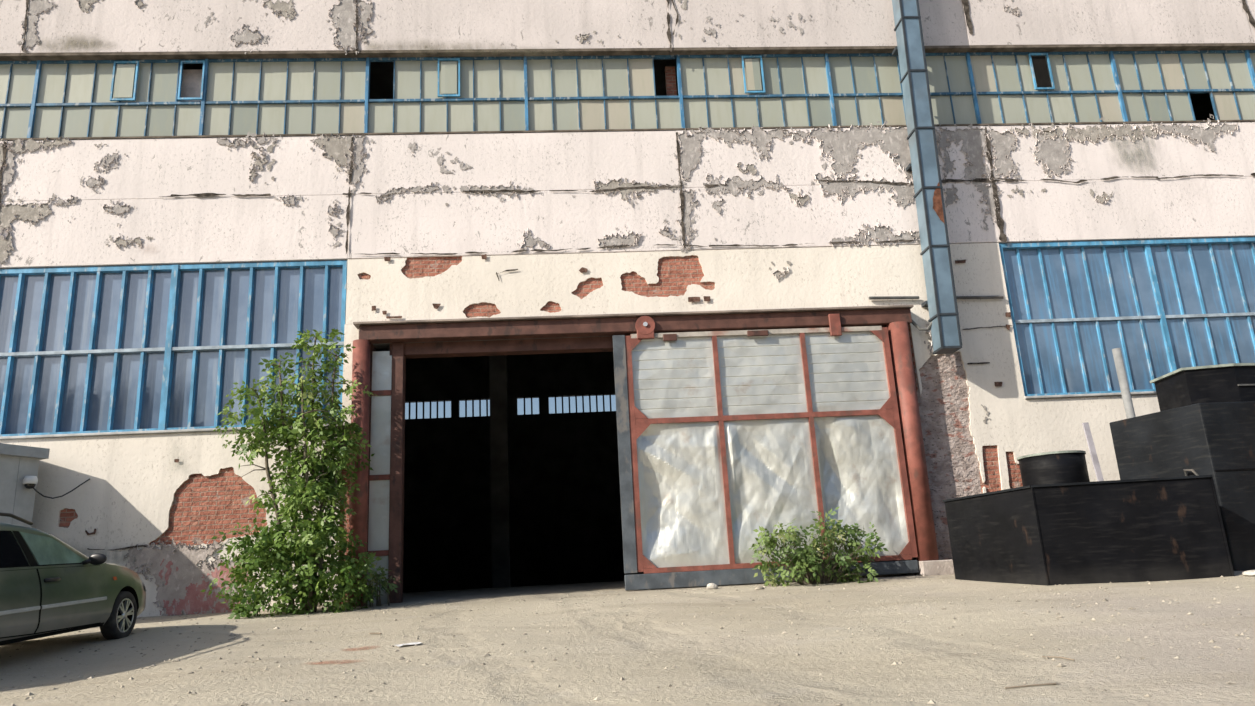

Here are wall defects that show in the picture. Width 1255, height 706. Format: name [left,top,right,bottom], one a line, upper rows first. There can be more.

crack [21,0,29,50]
crack [666,0,679,52]
crack [961,0,973,34]
crack [1242,0,1255,28]
spalling [384,256,463,279]
spalling [572,267,603,299]
crack [343,132,920,280]
peeling [593,121,920,302]
crack [819,127,1255,242]
peeling [935,114,1238,231]
spalling [915,324,1023,561]
spalling [123,467,267,616]